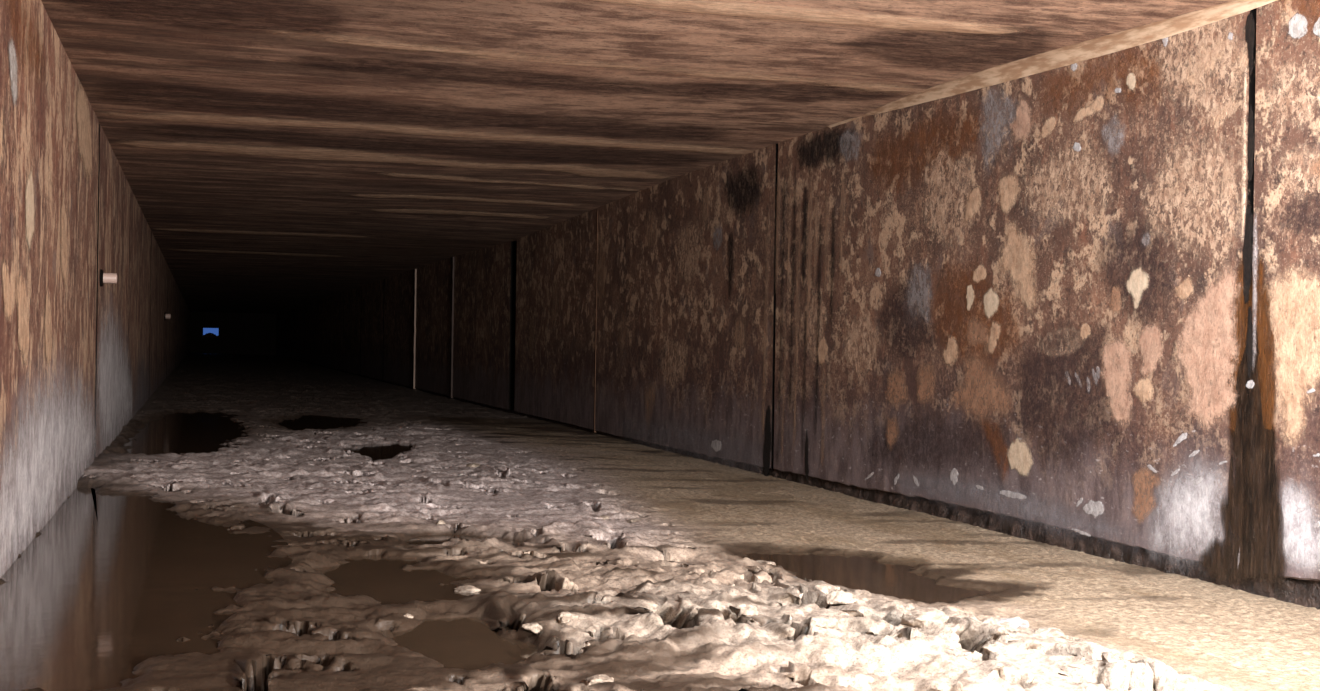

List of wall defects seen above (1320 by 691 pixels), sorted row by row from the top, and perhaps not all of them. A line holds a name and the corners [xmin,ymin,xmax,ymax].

rust [940,273,1011,357]
water stain [1155,258,1320,587]